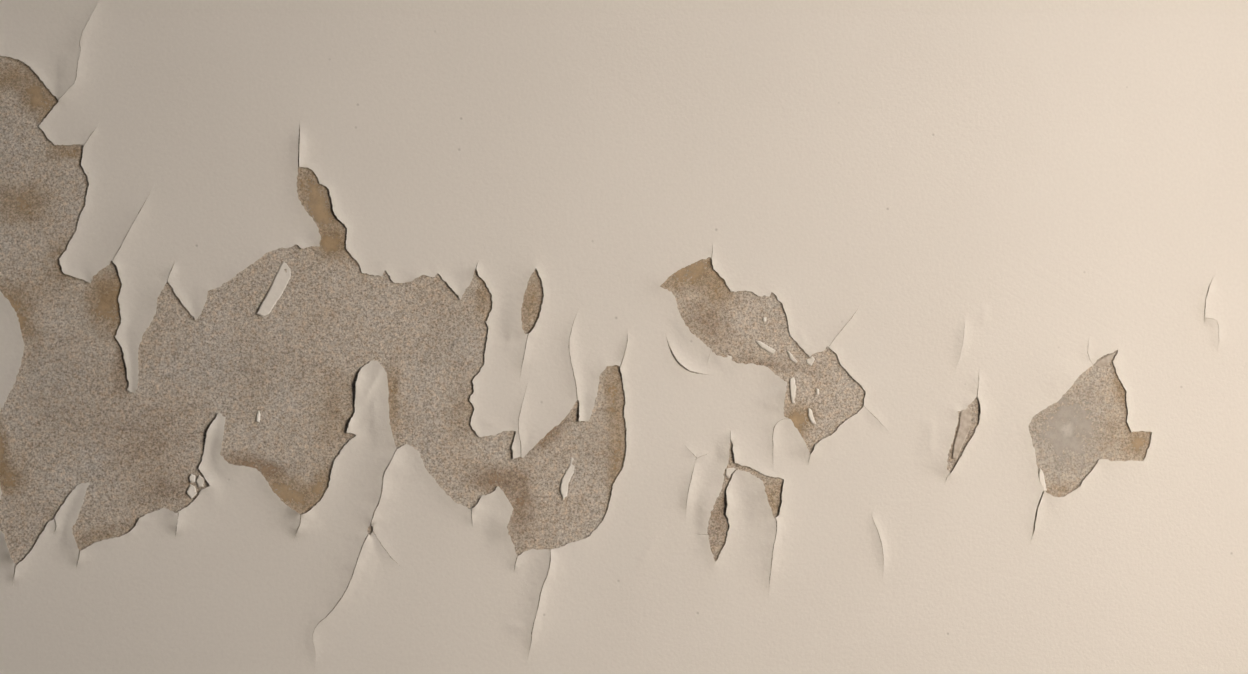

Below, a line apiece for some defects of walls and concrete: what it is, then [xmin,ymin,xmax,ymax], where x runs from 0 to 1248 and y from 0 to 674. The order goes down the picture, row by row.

peeling [0,0,640,674]
peeling [645,232,898,610]
peeling [936,359,992,493]
peeling [1014,325,1164,555]